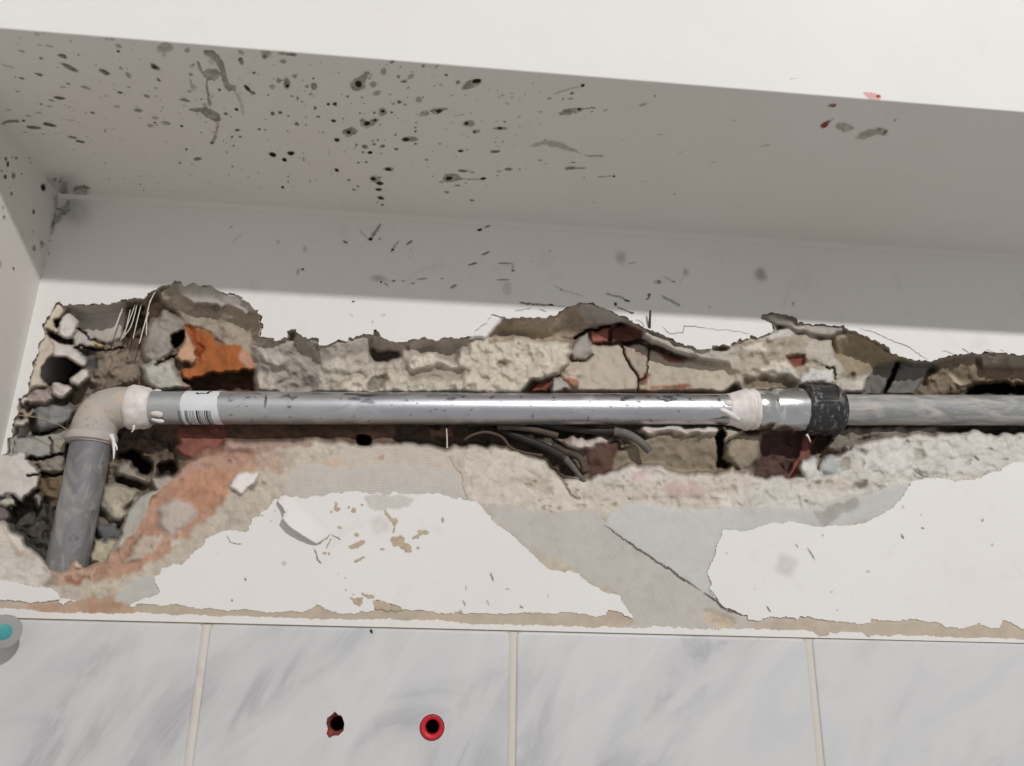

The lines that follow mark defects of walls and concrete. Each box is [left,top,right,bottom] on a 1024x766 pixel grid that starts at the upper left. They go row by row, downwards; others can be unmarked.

spalling [0,281,1024,644]